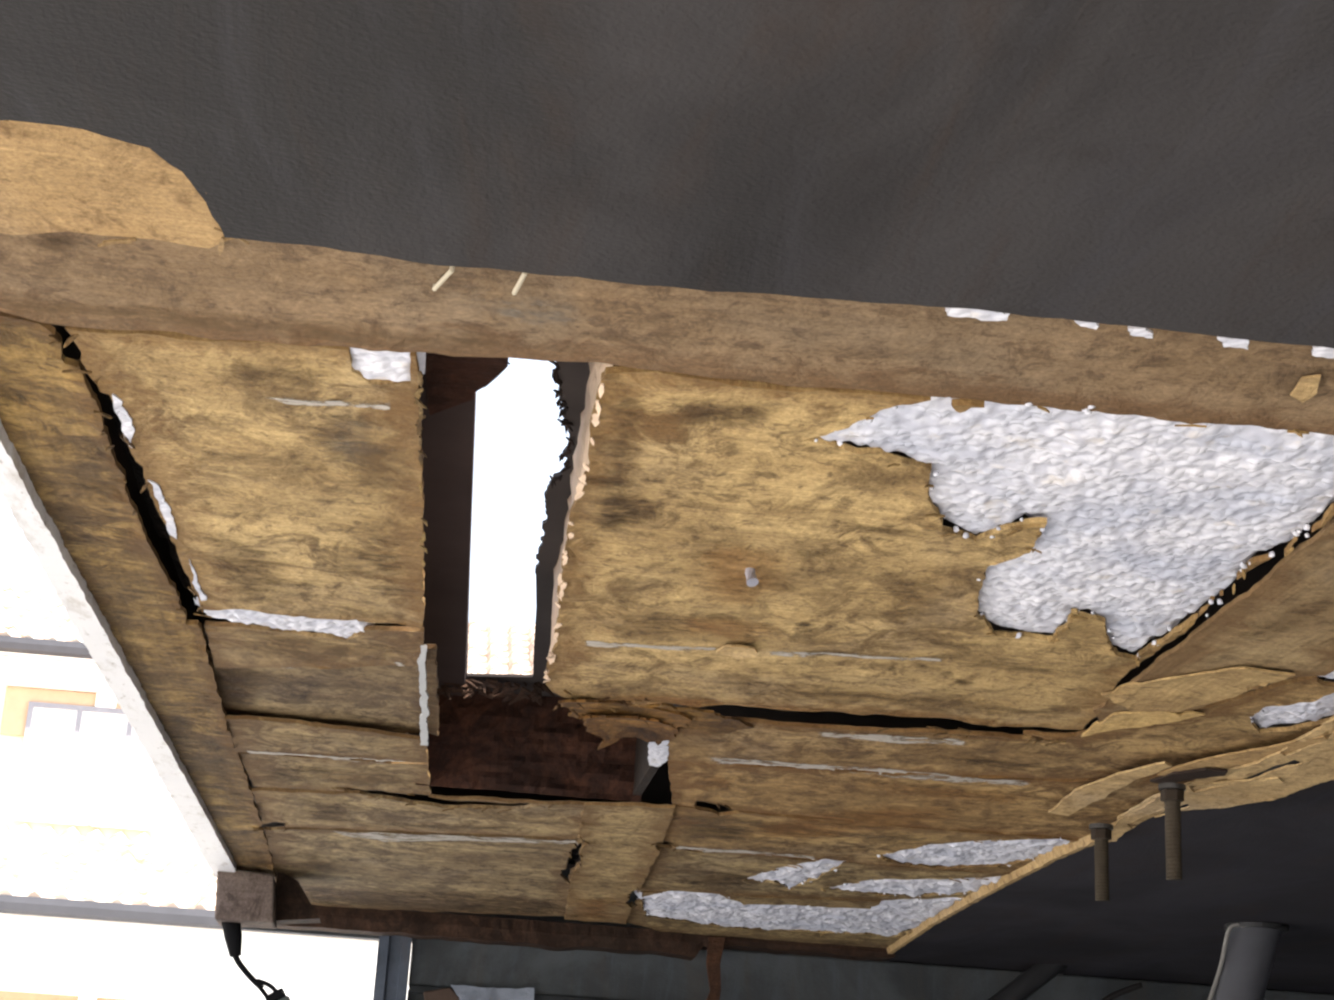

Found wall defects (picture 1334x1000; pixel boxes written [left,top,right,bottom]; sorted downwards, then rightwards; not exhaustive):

crack [48,334,212,618]
crack [1113,645,1138,653]
spalling [633,738,660,796]
crack [1025,737,1066,746]